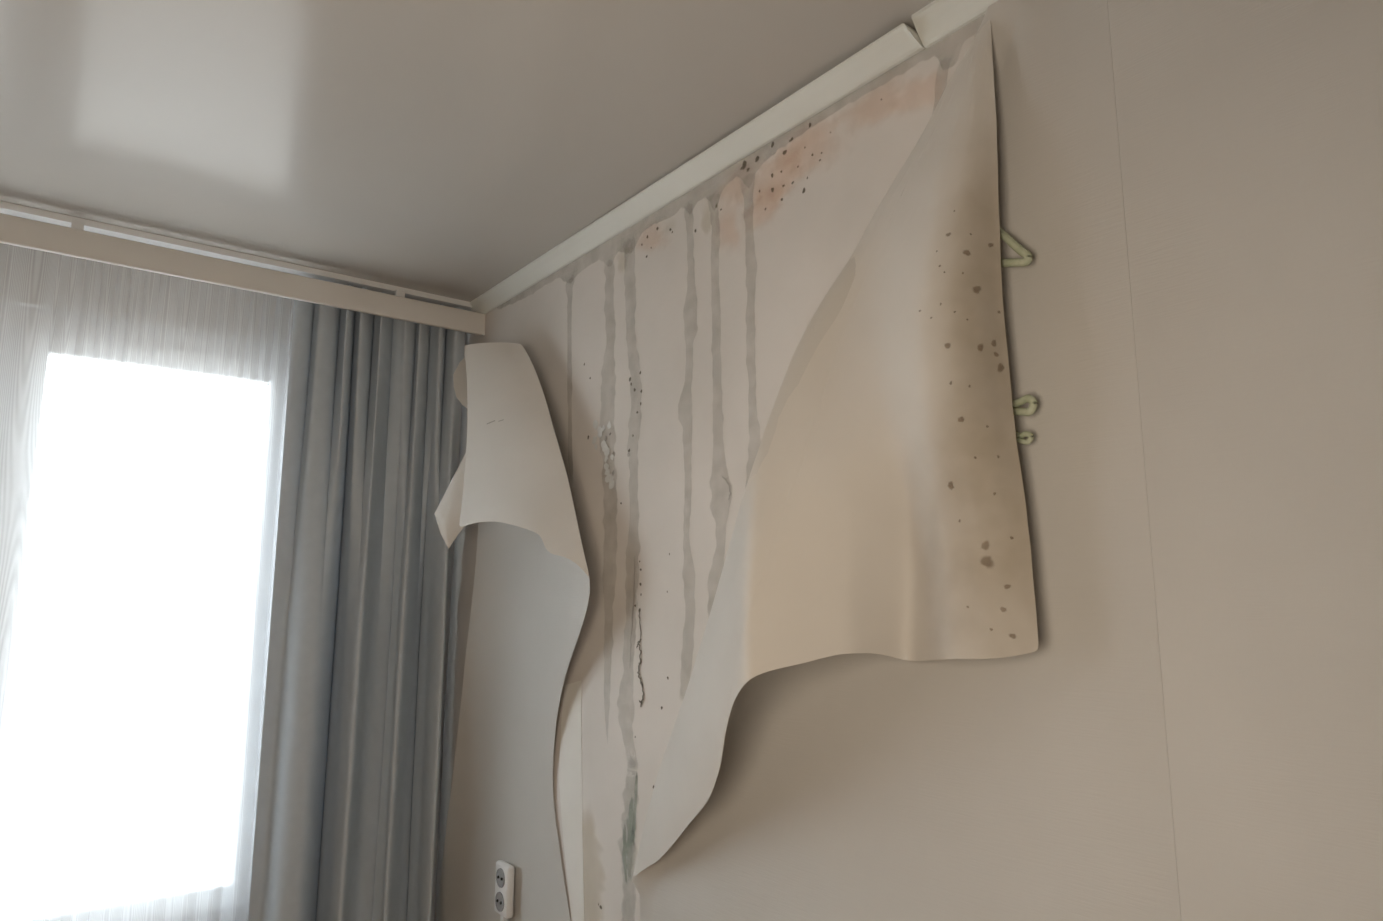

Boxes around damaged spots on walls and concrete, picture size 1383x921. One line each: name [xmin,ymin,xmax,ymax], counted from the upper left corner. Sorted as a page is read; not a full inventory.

leakage [740,137,822,201]